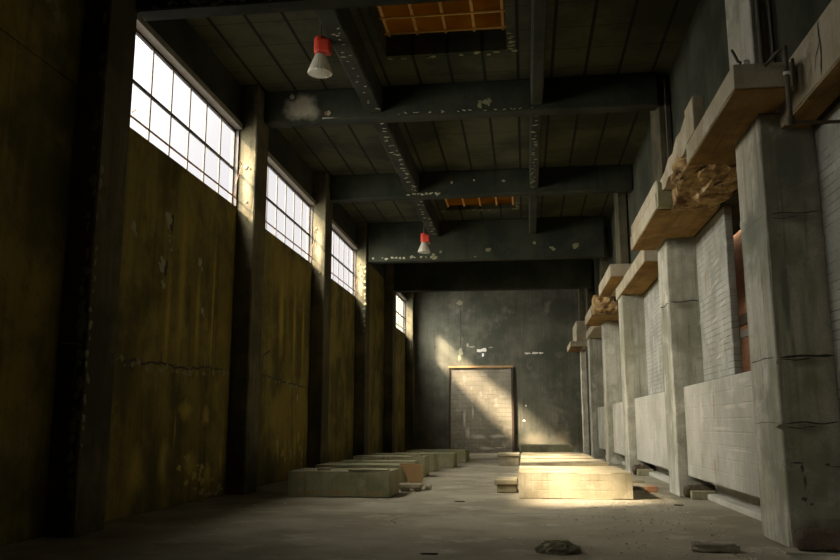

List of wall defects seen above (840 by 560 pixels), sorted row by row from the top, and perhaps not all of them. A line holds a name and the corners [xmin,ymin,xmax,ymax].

damp [277,90,348,126]
crack [660,295,699,323]
crack [115,352,229,381]
crack [752,351,835,372]
crack [755,418,840,438]